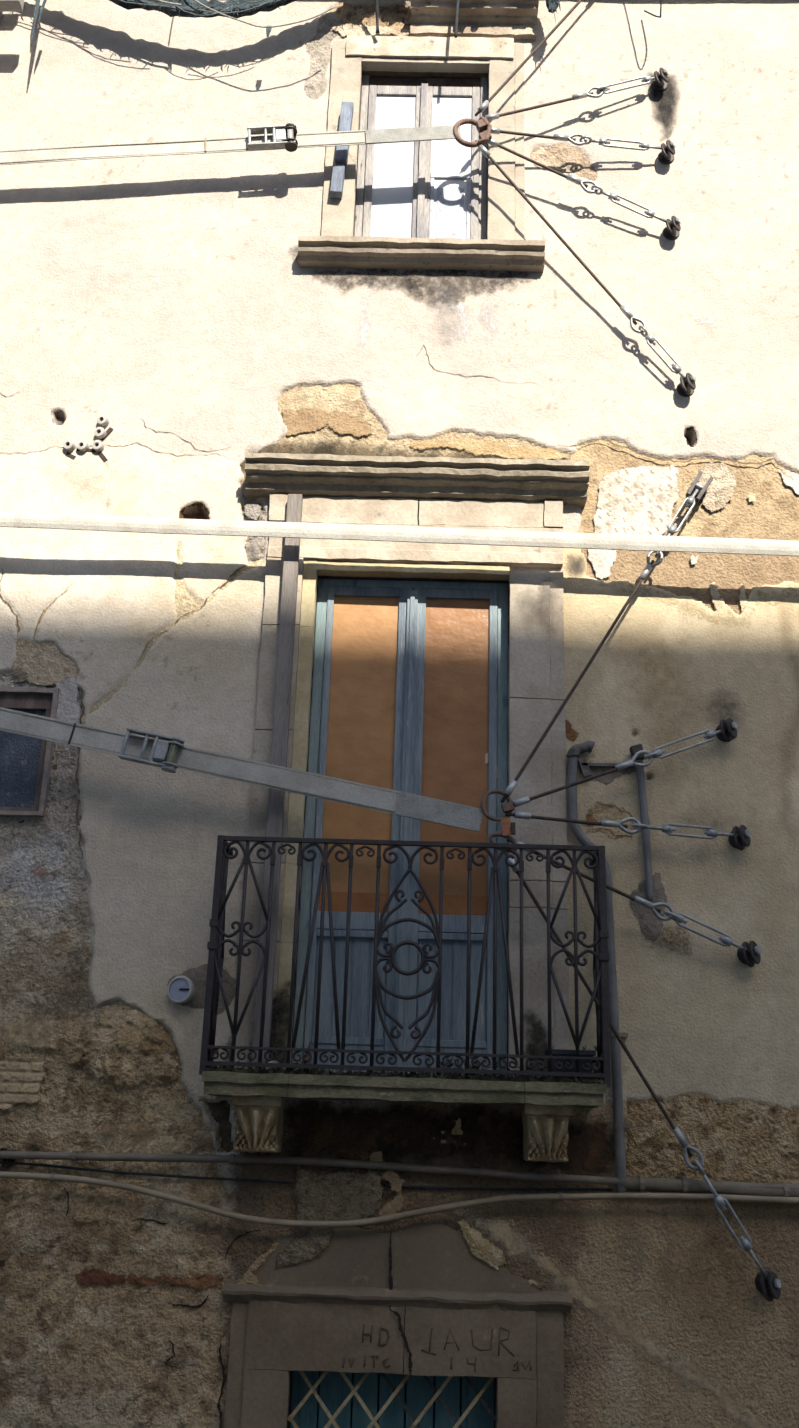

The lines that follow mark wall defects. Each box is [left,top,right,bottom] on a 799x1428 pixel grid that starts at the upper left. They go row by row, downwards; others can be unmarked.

flaking render [303,2,411,100]
damp [314,268,528,343]
crack [1,418,237,461]
damp [312,441,335,455]
flaking render [262,384,799,627]
crack [0,571,69,645]
flaking render [0,640,84,724]
crack [75,542,265,863]
flaking render [0,742,234,1205]
flaking render [625,1094,799,1183]
flaking render [75,1242,280,1290]
crack [388,1232,413,1379]